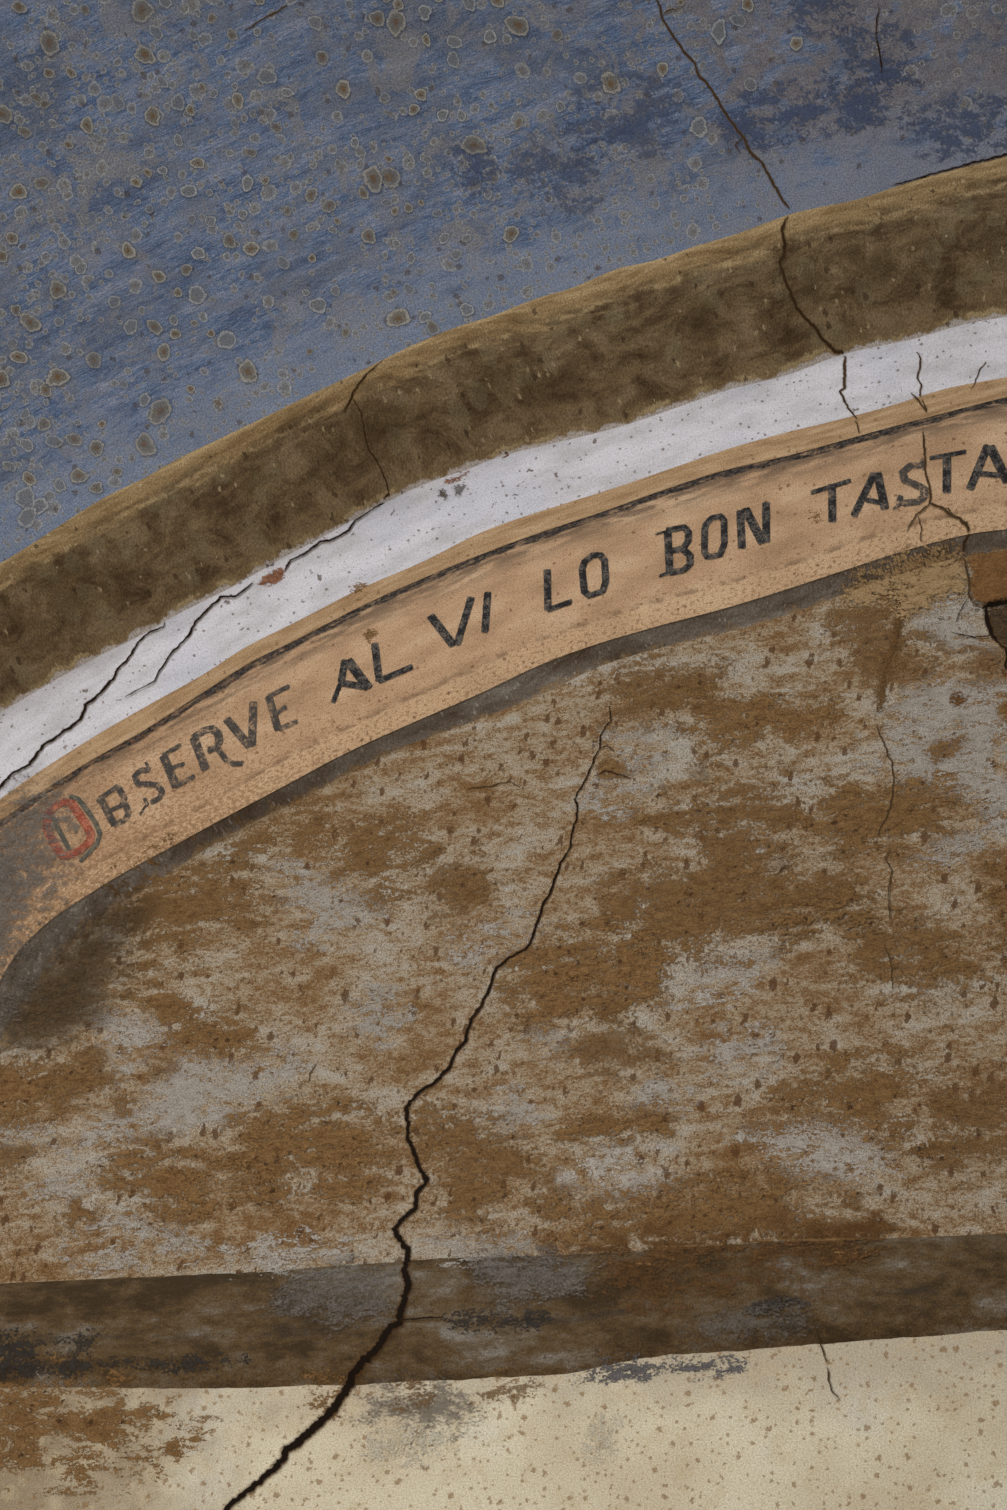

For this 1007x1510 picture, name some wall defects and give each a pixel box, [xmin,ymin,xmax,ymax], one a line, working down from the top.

leakage [342,0,464,69]
crack [875,7,883,72]
leakage [108,246,257,384]
leakage [204,148,270,256]
leakage [384,287,440,335]
crack [656,0,860,433]
leakage [0,349,172,528]
crack [285,361,390,570]
crack [907,352,1007,669]
crack [0,583,252,788]
flaking render [838,539,1007,872]
crack [224,706,628,1510]